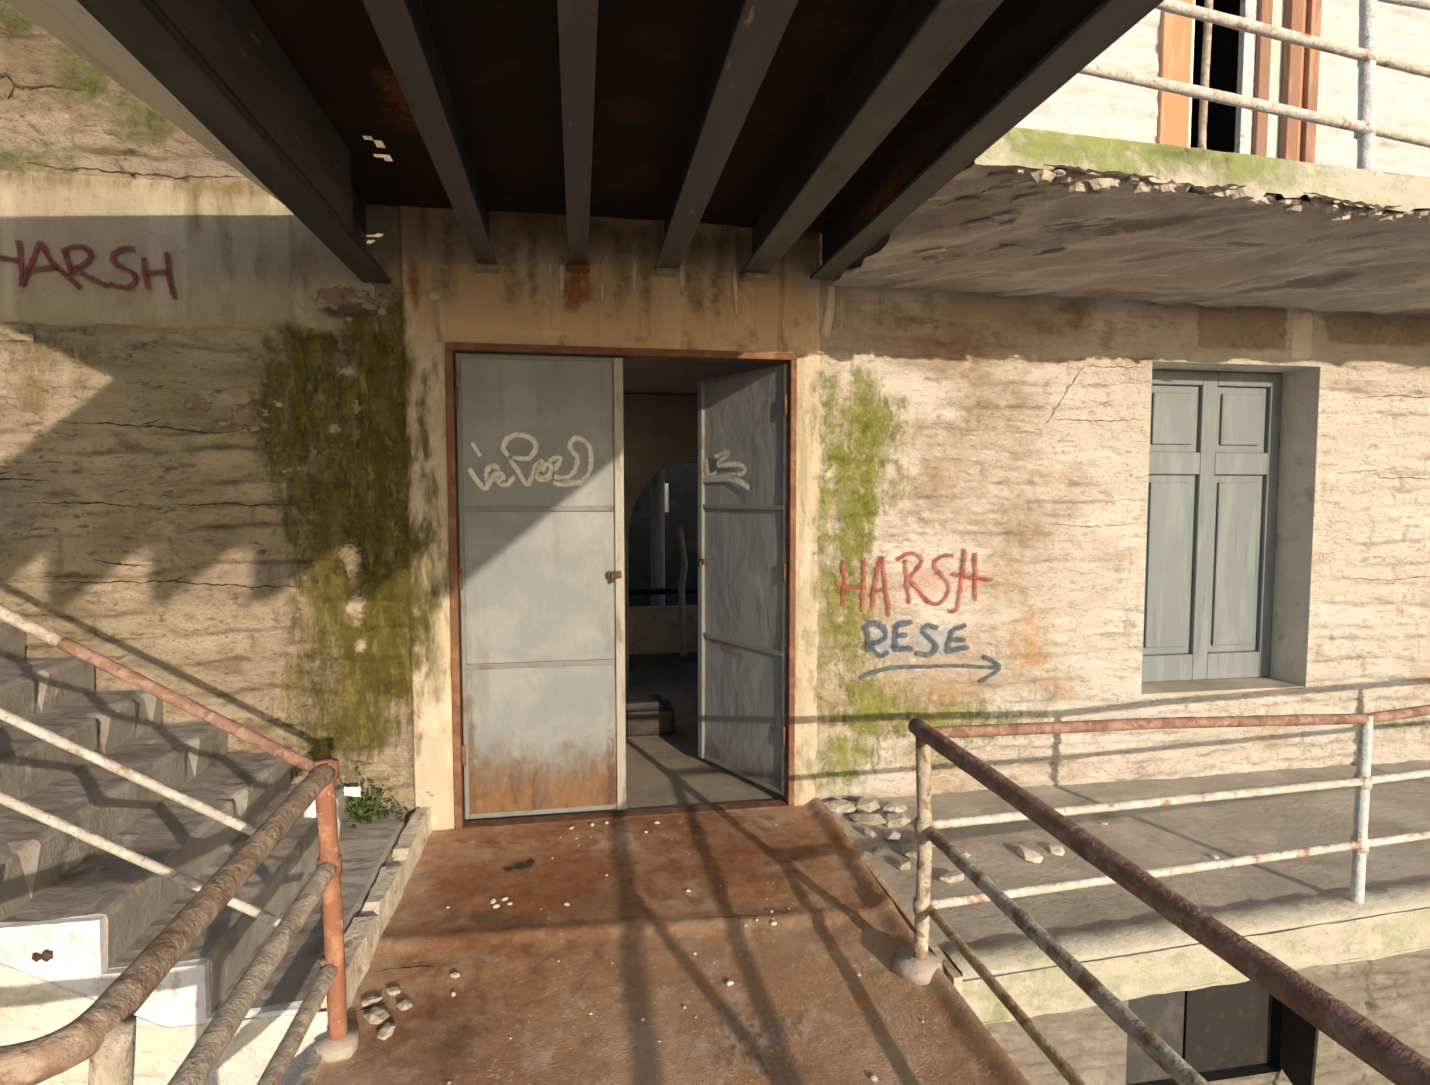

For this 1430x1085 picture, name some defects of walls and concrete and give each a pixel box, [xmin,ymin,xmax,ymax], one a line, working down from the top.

crack [0,72,72,98]
spalling [938,164,1430,229]
corrosion [469,758,617,814]
corrosion [443,855,622,952]